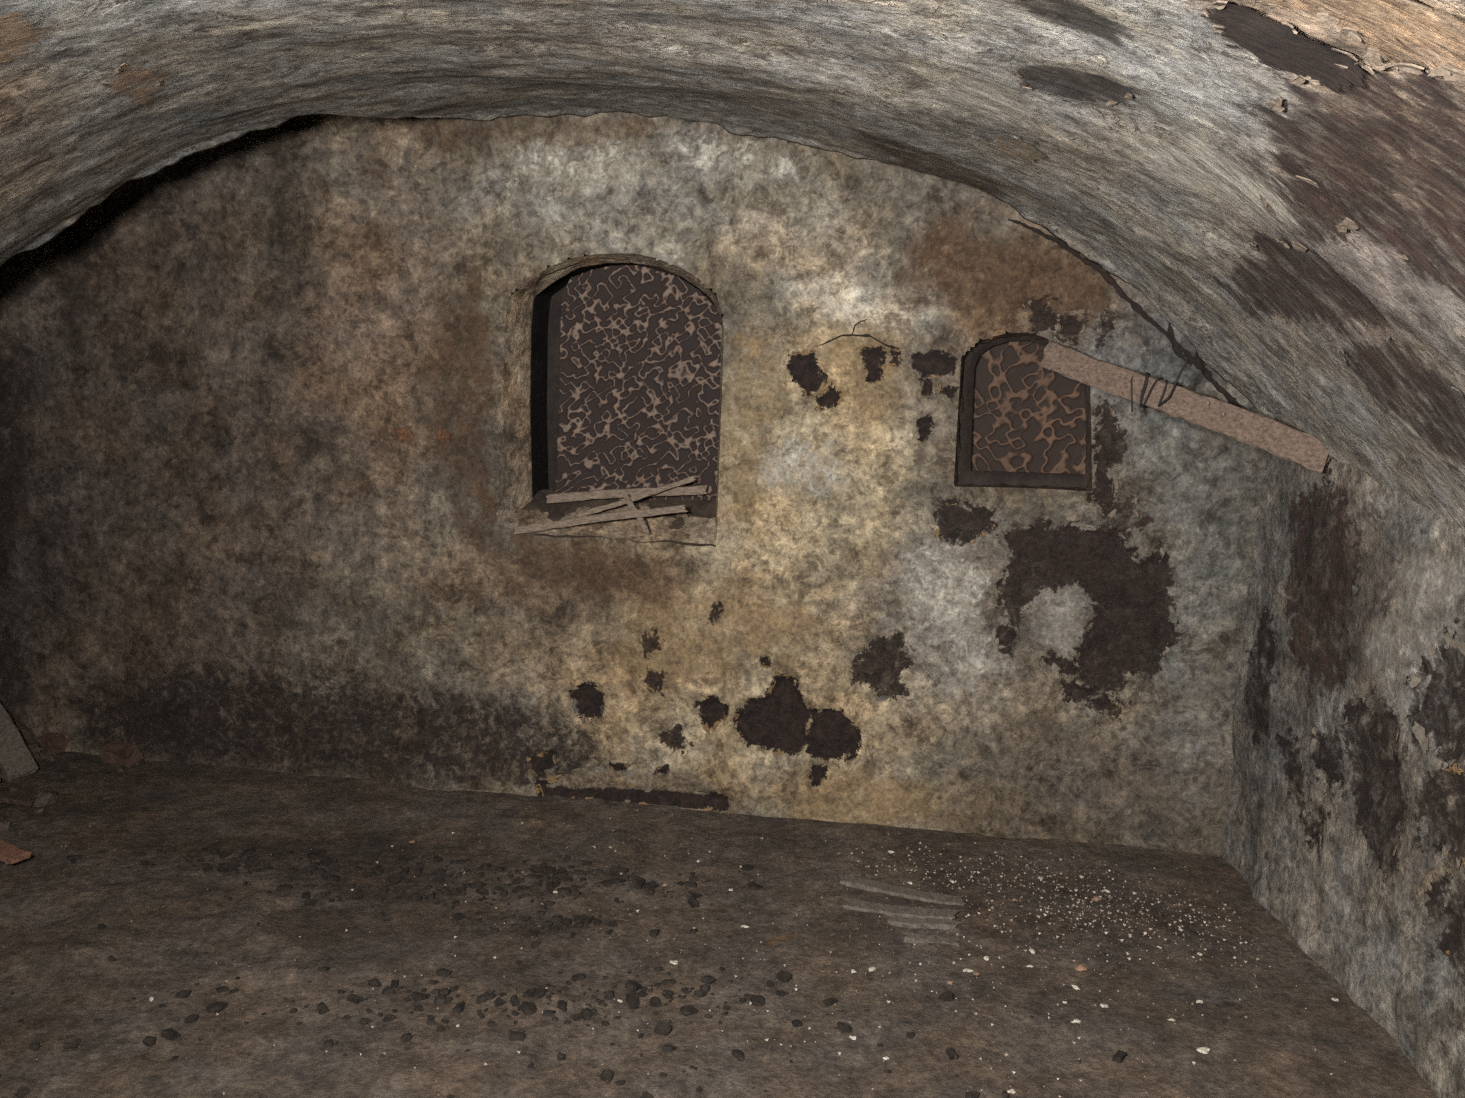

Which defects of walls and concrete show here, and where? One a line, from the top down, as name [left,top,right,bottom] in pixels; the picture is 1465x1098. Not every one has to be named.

flaking render [1022,0,1127,46]
damp [951,78,1039,130]
flaking render [1013,64,1135,106]
damp [1149,134,1304,233]
flaking render [1200,0,1465,477]
flaking render [1011,292,1121,348]
flaking render [787,349,846,411]
flaking render [855,345,958,444]
damp [1029,588,1090,658]
damp [1366,552,1458,728]
damp [1413,854,1461,900]